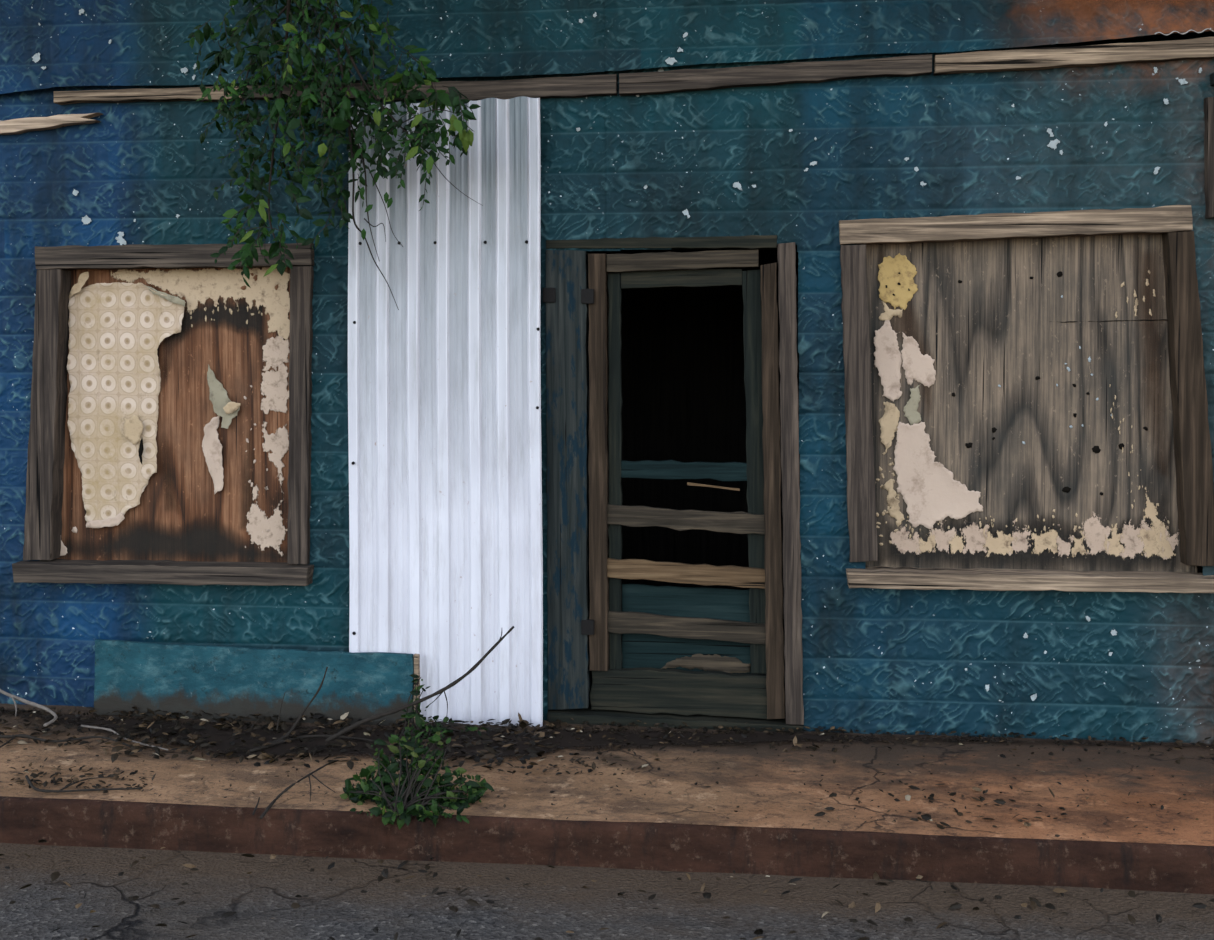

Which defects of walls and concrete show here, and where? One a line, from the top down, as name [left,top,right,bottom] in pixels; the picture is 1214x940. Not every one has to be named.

peeling [1115,270,1156,318]
peeling [111,267,290,556]
peeling [890,469,1179,560]